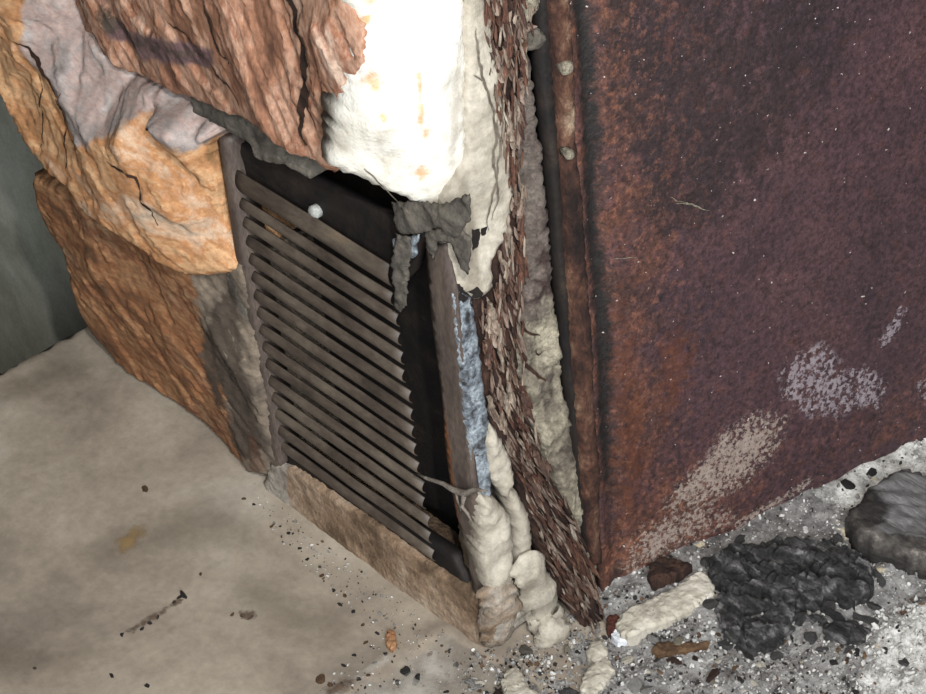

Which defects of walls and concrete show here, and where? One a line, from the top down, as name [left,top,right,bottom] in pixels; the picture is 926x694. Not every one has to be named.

peeling [390,194,487,312]
spalling [456,284,483,335]
damp [627,414,811,571]
spalling [386,630,397,653]